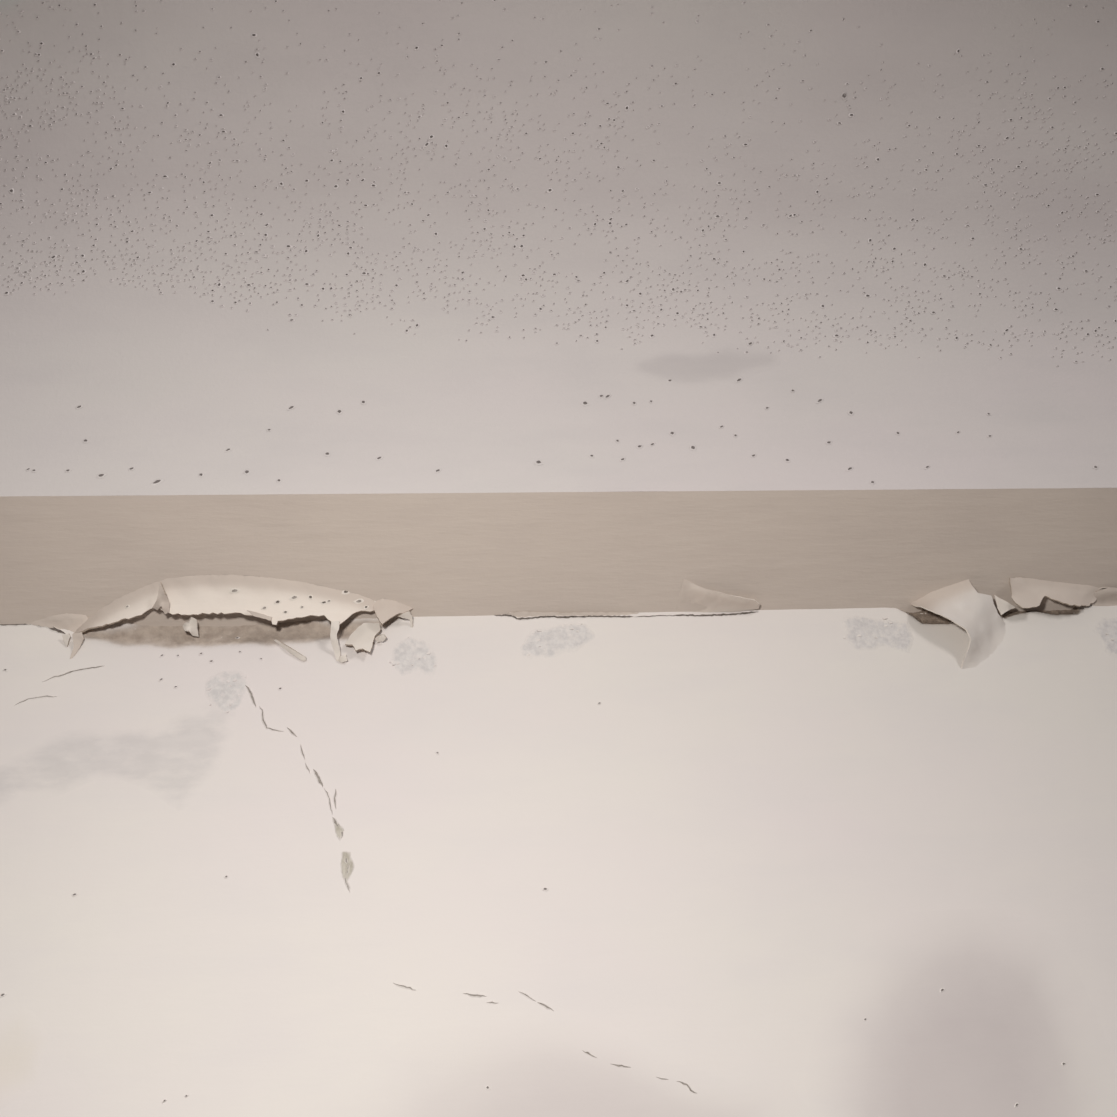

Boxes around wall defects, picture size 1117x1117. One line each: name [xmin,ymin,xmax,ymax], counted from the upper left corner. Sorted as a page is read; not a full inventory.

peeling [841,577,1117,669]
spalling [26,598,438,676]
crack [245,685,337,814]
crack [393,983,415,991]
crack [463,991,554,1011]
crack [582,1050,631,1068]
crack [656,1077,696,1093]